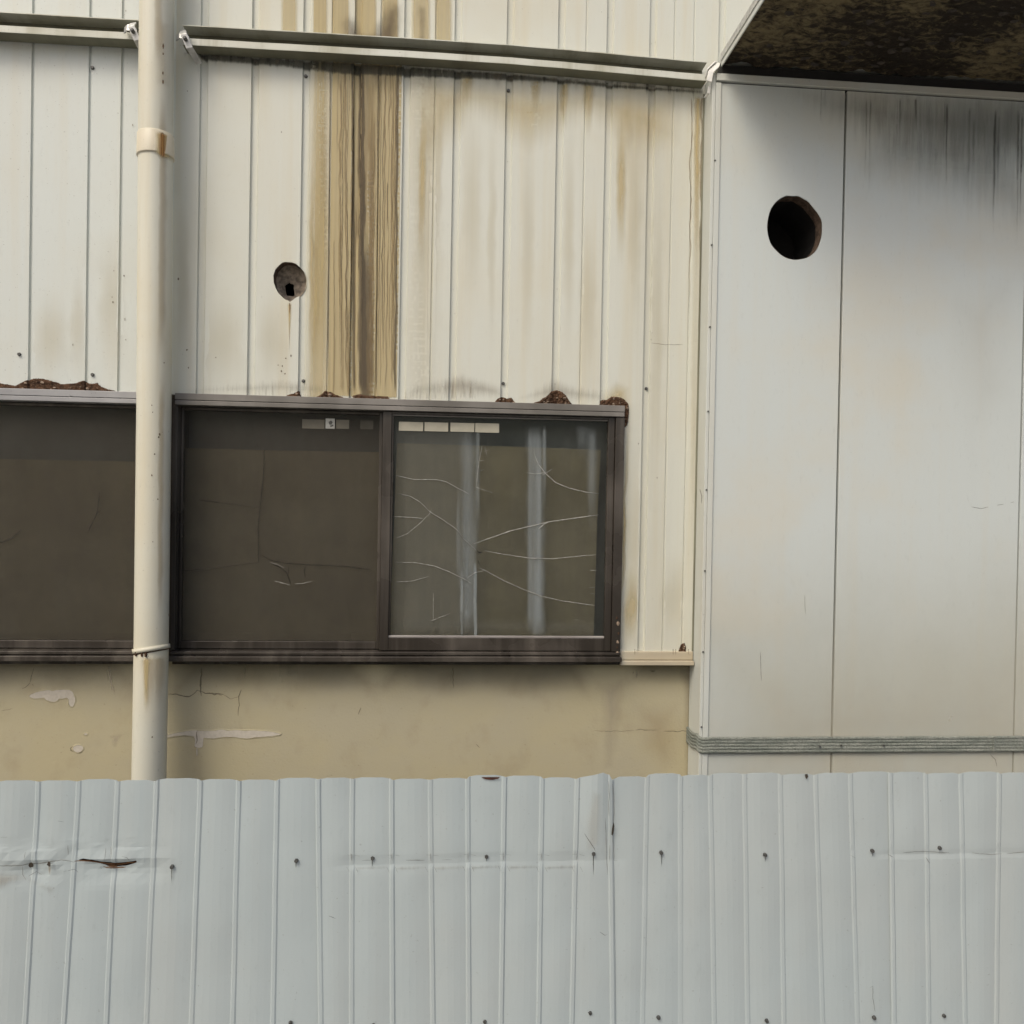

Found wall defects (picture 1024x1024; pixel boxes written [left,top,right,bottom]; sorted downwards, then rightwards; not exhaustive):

water stain [199,54,678,397]
rust [0,378,114,391]
rust [535,390,572,404]
rust [600,397,629,427]
peeling [28,688,77,708]
peeling [167,728,282,757]
rust [77,860,134,868]